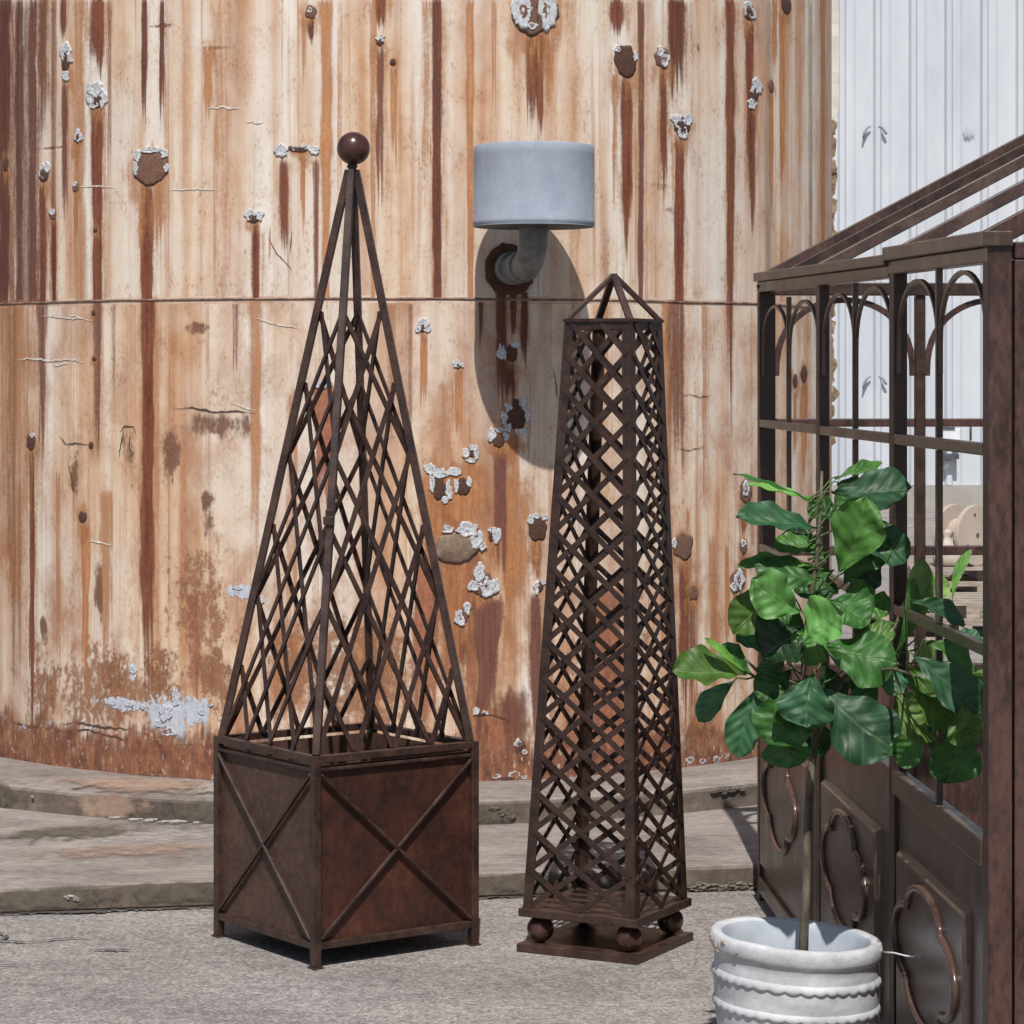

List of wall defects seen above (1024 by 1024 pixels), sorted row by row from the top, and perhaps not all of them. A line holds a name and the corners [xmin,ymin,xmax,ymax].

peeling [510,0,561,130]
rust [610,0,644,300]
peeling [654,46,693,301]
rust [0,0,231,818]
crack [176,406,255,414]
rust [491,292,552,599]
peeling [129,661,137,681]
peeling [93,687,213,743]
rust [270,384,580,781]
peeling [423,427,510,736]
rust [638,679,757,771]